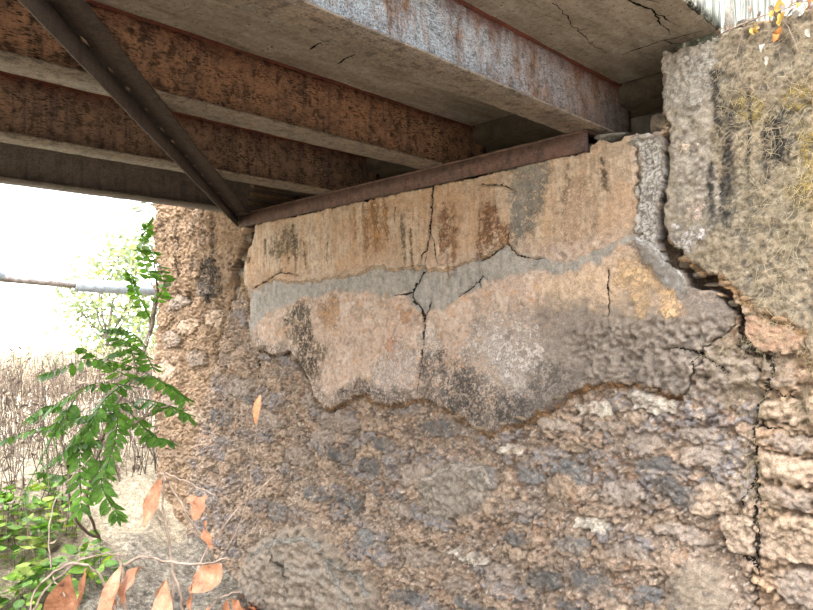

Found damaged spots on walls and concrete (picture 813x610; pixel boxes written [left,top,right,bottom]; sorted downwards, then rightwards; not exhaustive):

crack [526,0,701,55]
peeling [664,47,715,108]
crack [212,223,295,347]
leakage [264,225,306,266]
leakage [394,207,413,268]
crack [395,185,438,393]
crack [461,231,546,296]
spalling [629,133,664,247]
spalling [667,201,809,338]
spalling [256,345,684,440]
crack [663,202,796,583]
spalling [795,349,813,379]